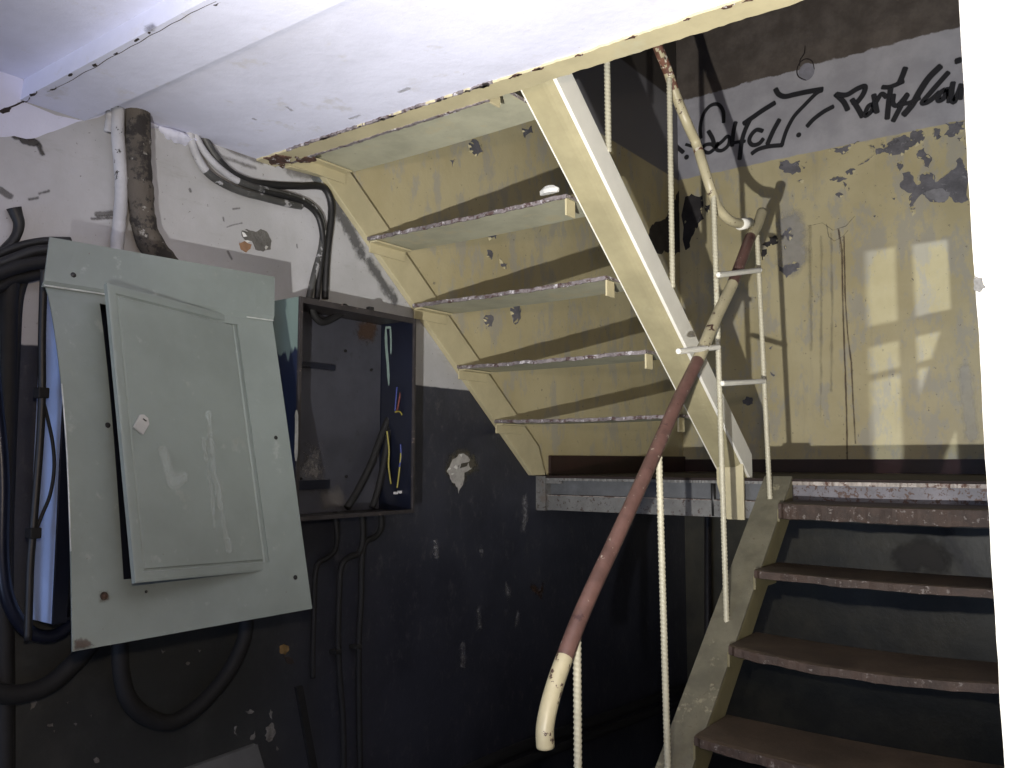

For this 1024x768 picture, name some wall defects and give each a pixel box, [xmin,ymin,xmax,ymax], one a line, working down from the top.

crack [0,2,218,156]
peeling [290,83,490,164]
corrosion [263,154,317,178]
peeling [778,160,805,183]
peeling [829,120,968,216]
spalling [239,229,272,252]
peeling [649,191,710,255]
peeling [510,306,521,325]
spalling [446,450,478,493]